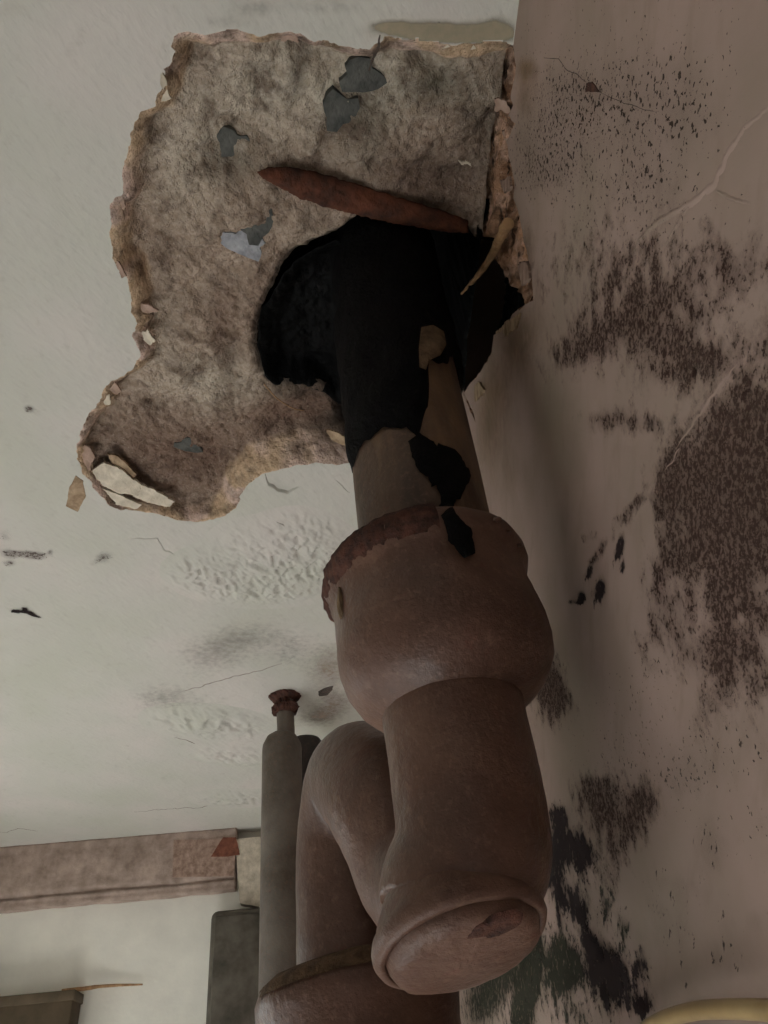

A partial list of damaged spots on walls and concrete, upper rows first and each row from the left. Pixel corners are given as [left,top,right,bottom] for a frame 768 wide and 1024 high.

spalling [66,29,533,522]
corrosion [257,166,469,233]
leakage [460,12,768,1024]